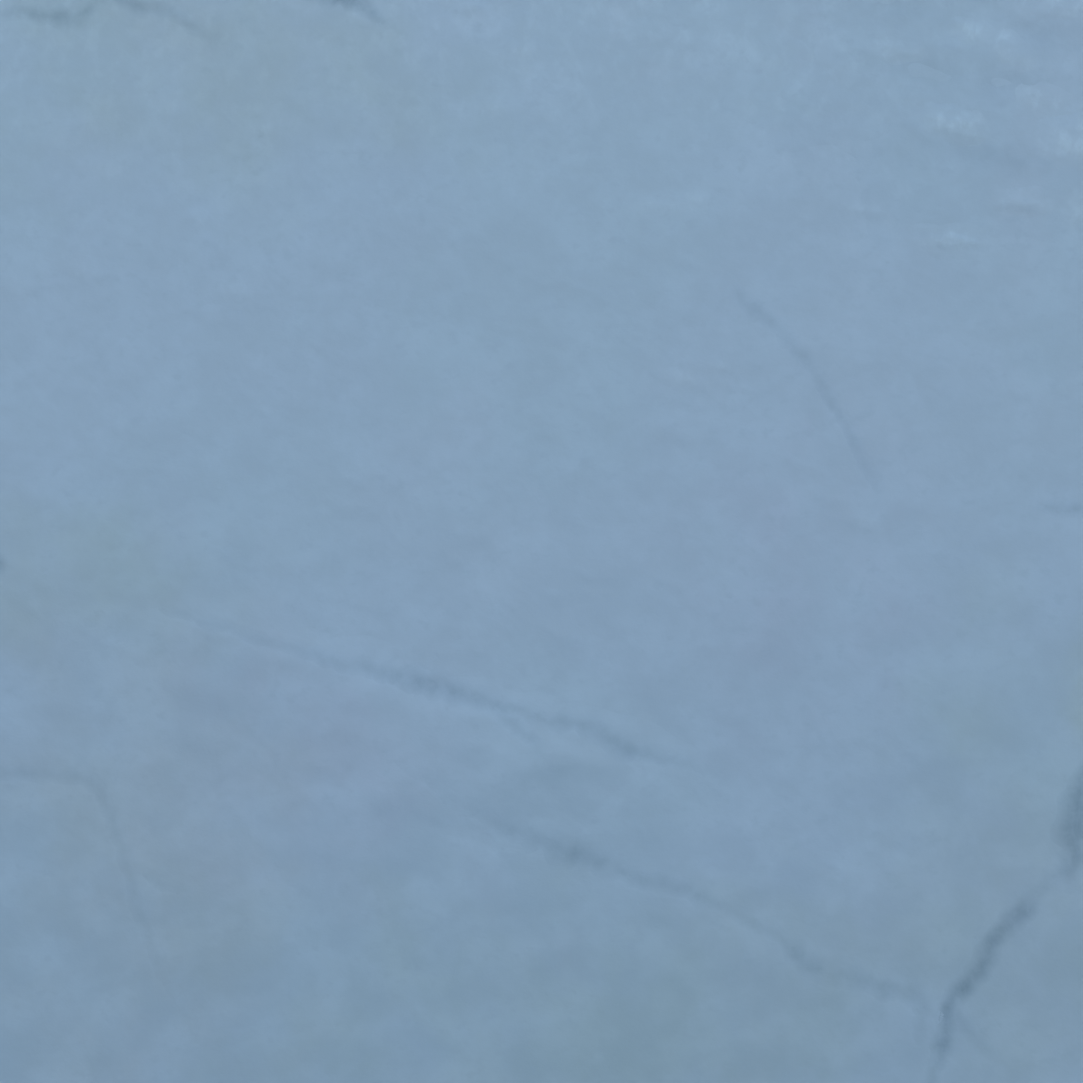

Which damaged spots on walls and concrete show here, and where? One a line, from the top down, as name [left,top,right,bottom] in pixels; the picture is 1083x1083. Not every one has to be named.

crack [923,756,1083,1083]